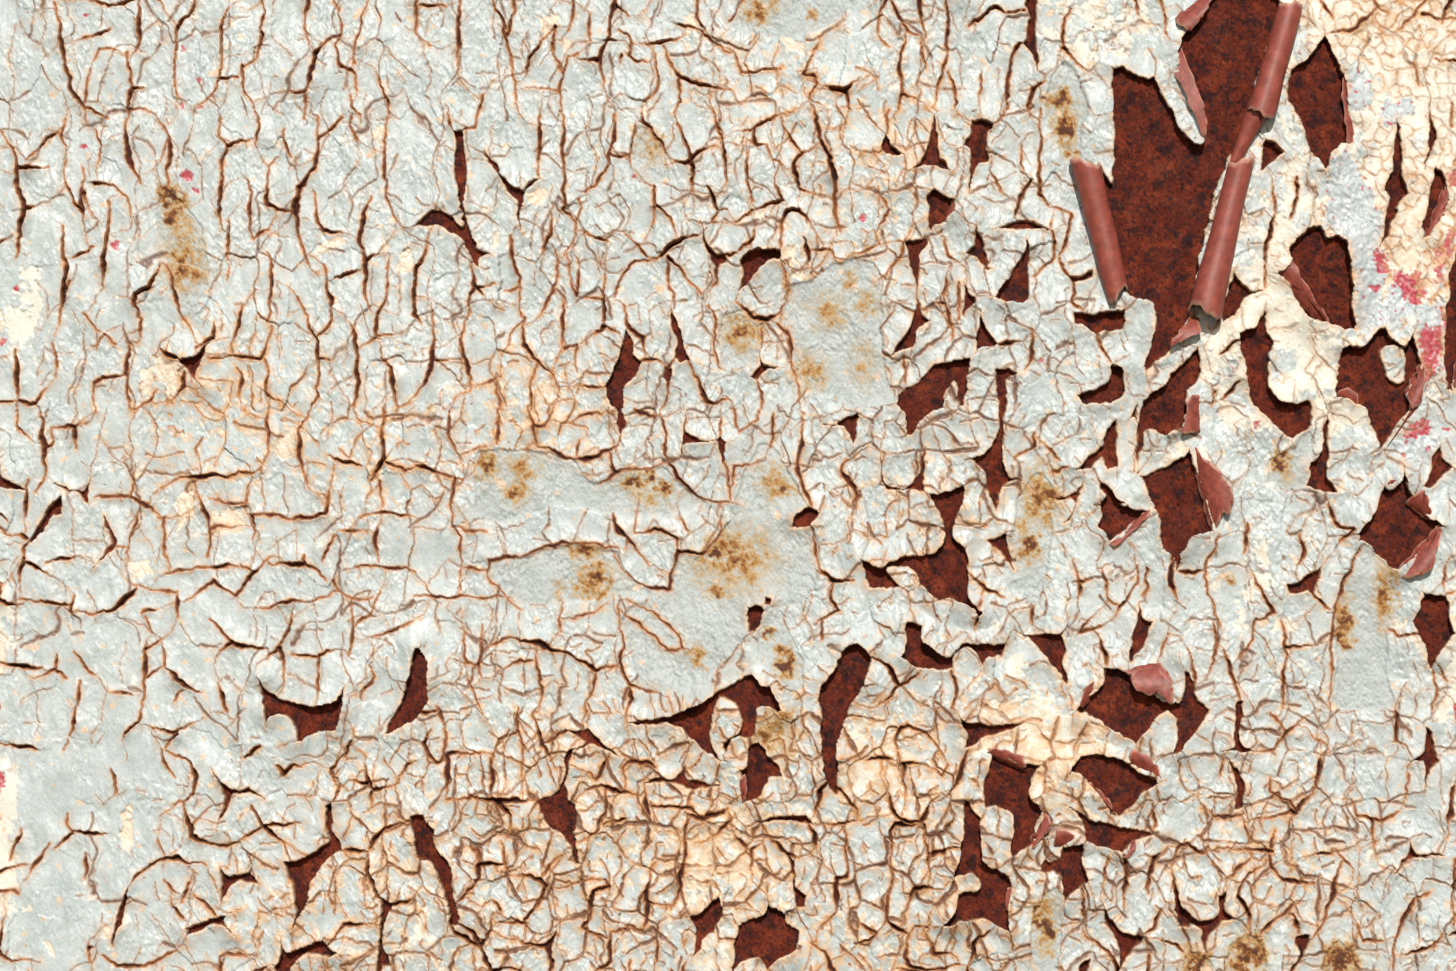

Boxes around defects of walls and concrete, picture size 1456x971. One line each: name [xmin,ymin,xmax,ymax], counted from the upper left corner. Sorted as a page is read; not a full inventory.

crack [1133,0,1182,47]
peeling [256,676,347,746]
crack [0,0,1113,971]
peeling [602,444,875,803]
peeling [684,870,817,971]
peeling [736,115,1054,620]
peeling [897,605,1212,971]
crack [1198,338,1248,408]
peeling [1049,0,1456,576]
crack [1070,491,1456,971]
crack [1262,167,1300,289]
peeling [1330,443,1456,714]